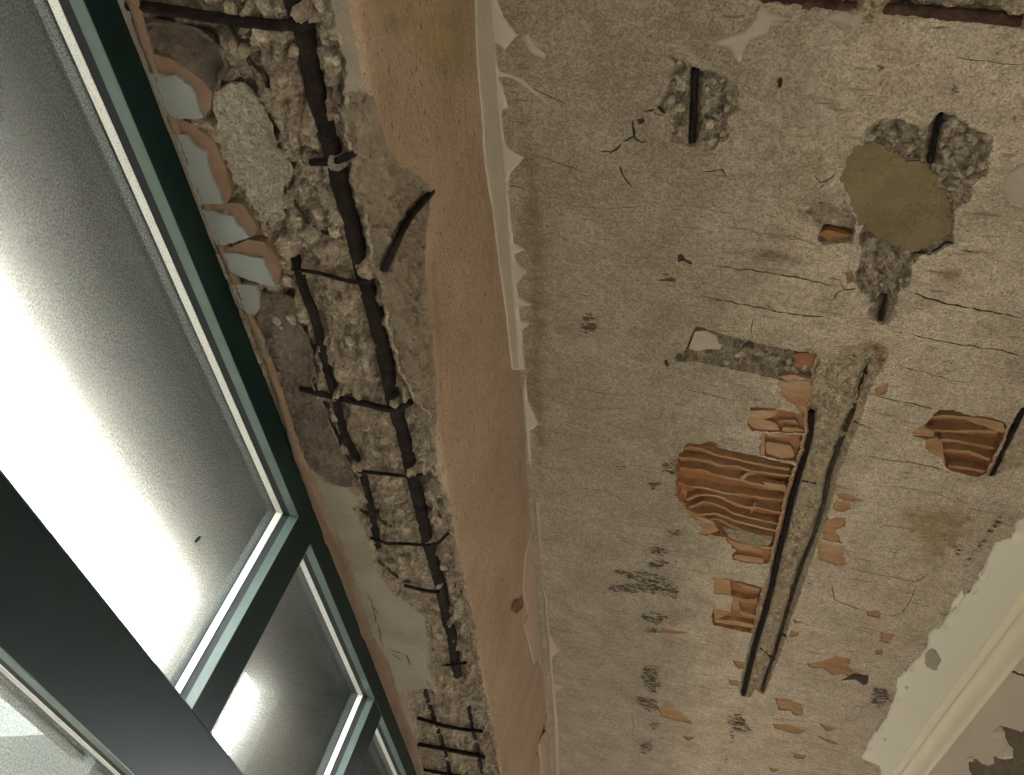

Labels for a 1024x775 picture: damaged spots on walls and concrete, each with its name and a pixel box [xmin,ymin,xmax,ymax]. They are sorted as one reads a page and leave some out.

spalling [654,53,741,152]
spalling [138,0,502,775]
flaking render [475,0,548,465]
crack [704,266,856,339]
spalling [674,327,889,734]
spalling [783,112,994,325]
crack [852,365,933,429]
crack [907,332,1020,356]
crack [911,292,1021,318]
spalling [912,410,1024,477]
flaking render [522,500,564,775]
peeling [861,518,1024,775]